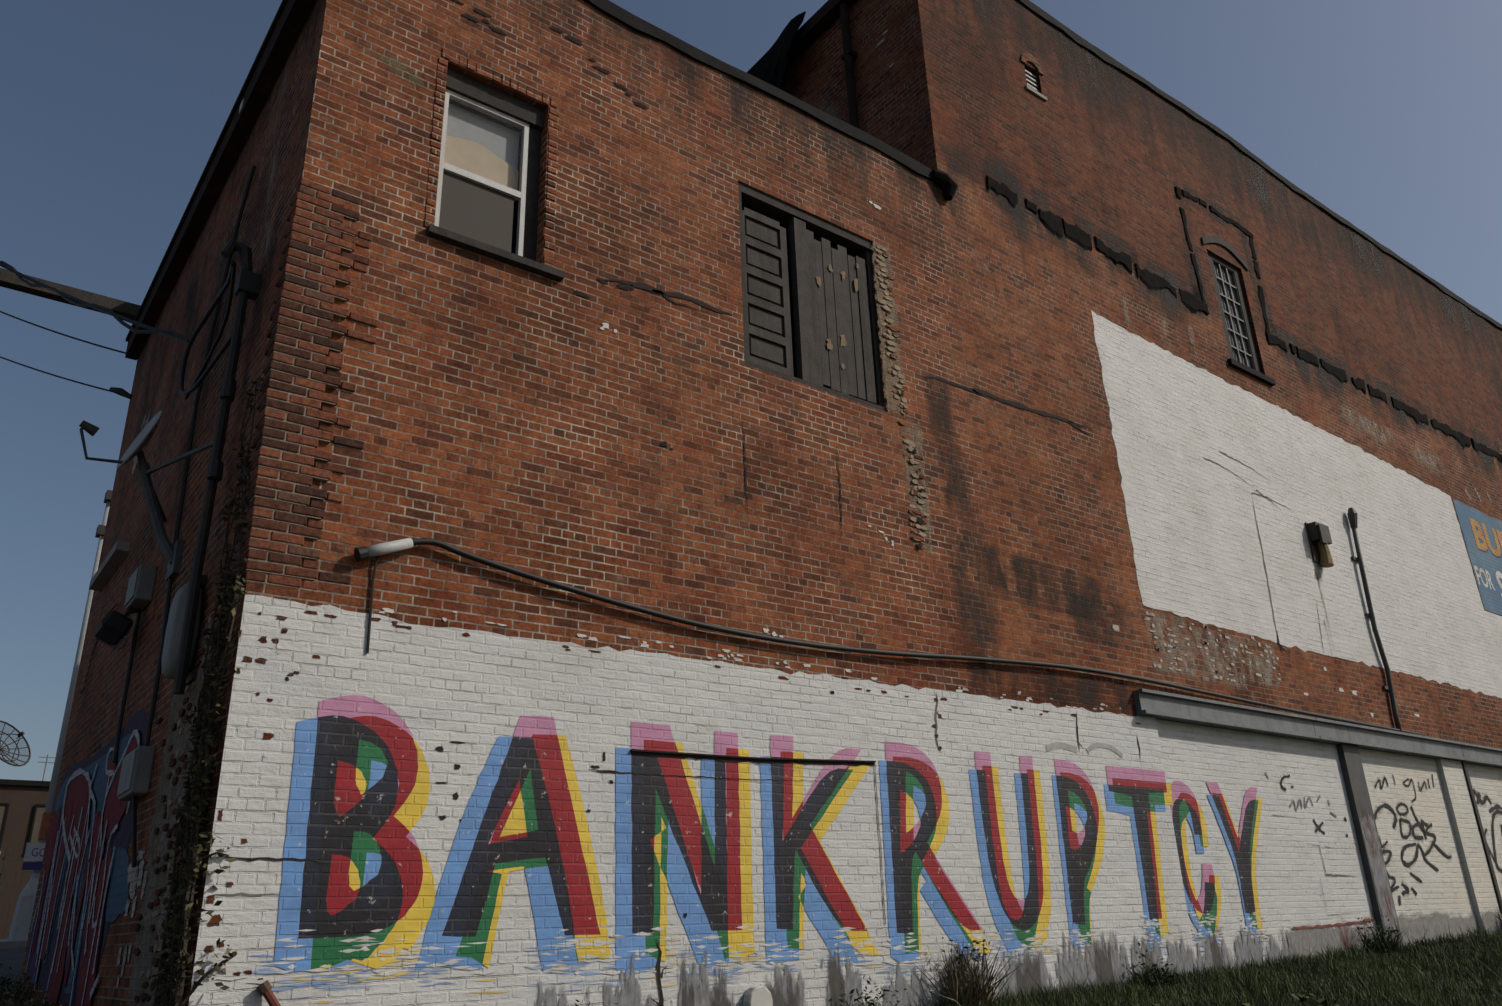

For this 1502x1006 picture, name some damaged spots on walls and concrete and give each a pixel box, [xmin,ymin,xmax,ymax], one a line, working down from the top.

crack [603,279,734,315]
crack [916,371,1094,438]
peeling [236,610,337,674]
peeling [371,608,412,630]
peeling [707,649,744,668]
peeling [1144,611,1281,683]
peeling [1000,691,1121,717]
peeling [204,882,237,954]